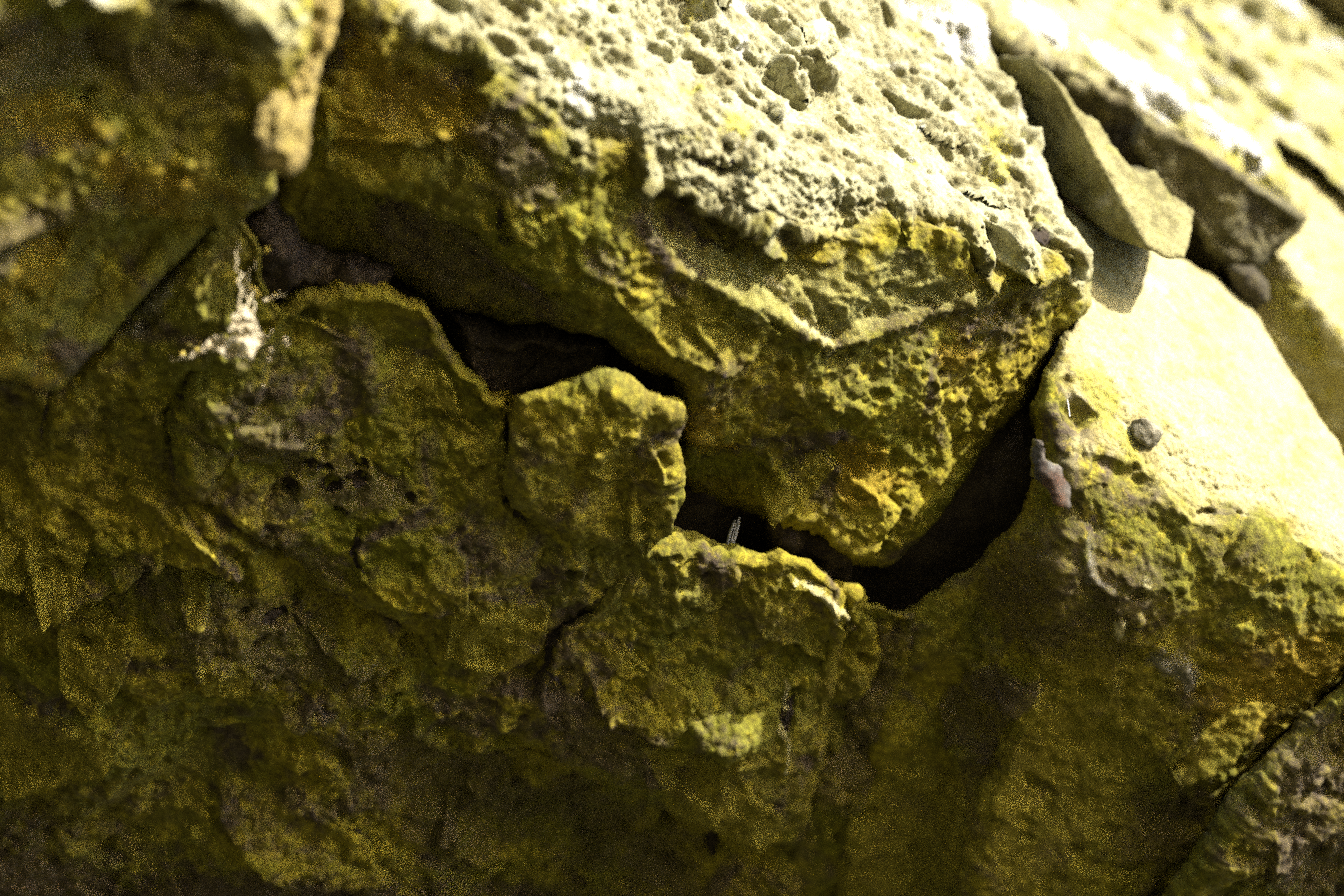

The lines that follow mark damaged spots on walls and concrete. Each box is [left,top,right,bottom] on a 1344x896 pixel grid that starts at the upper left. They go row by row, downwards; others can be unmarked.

crack [694,156,736,172]
crack [496,206,515,251]
crack [500,398,527,522]